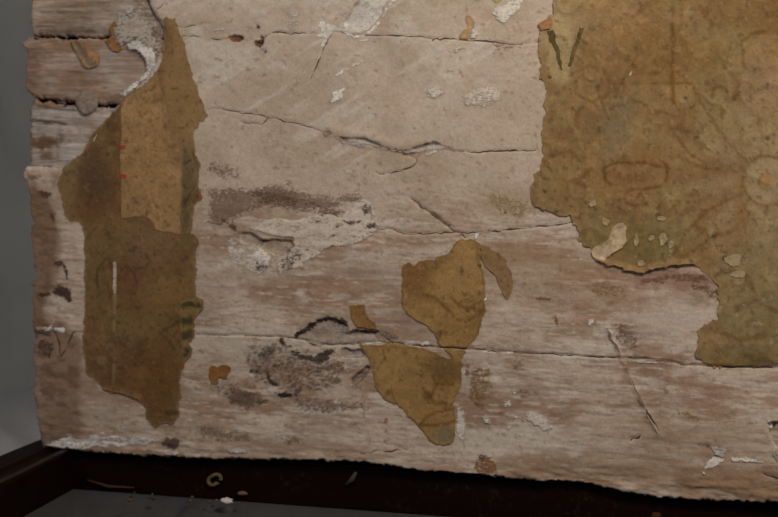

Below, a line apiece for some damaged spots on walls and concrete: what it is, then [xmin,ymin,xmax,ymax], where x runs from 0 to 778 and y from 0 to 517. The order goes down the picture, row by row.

spalling [317,0,396,49]
spalling [113,2,165,97]
crack [263,31,539,78]
peeling [330,87,345,103]
crack [208,108,330,134]
crack [467,147,535,155]
peeling [224,199,379,276]
spalling [294,315,430,386]
damp [210,336,369,414]
peeling [456,405,467,440]
peeling [507,411,553,431]
peeling [699,442,763,474]